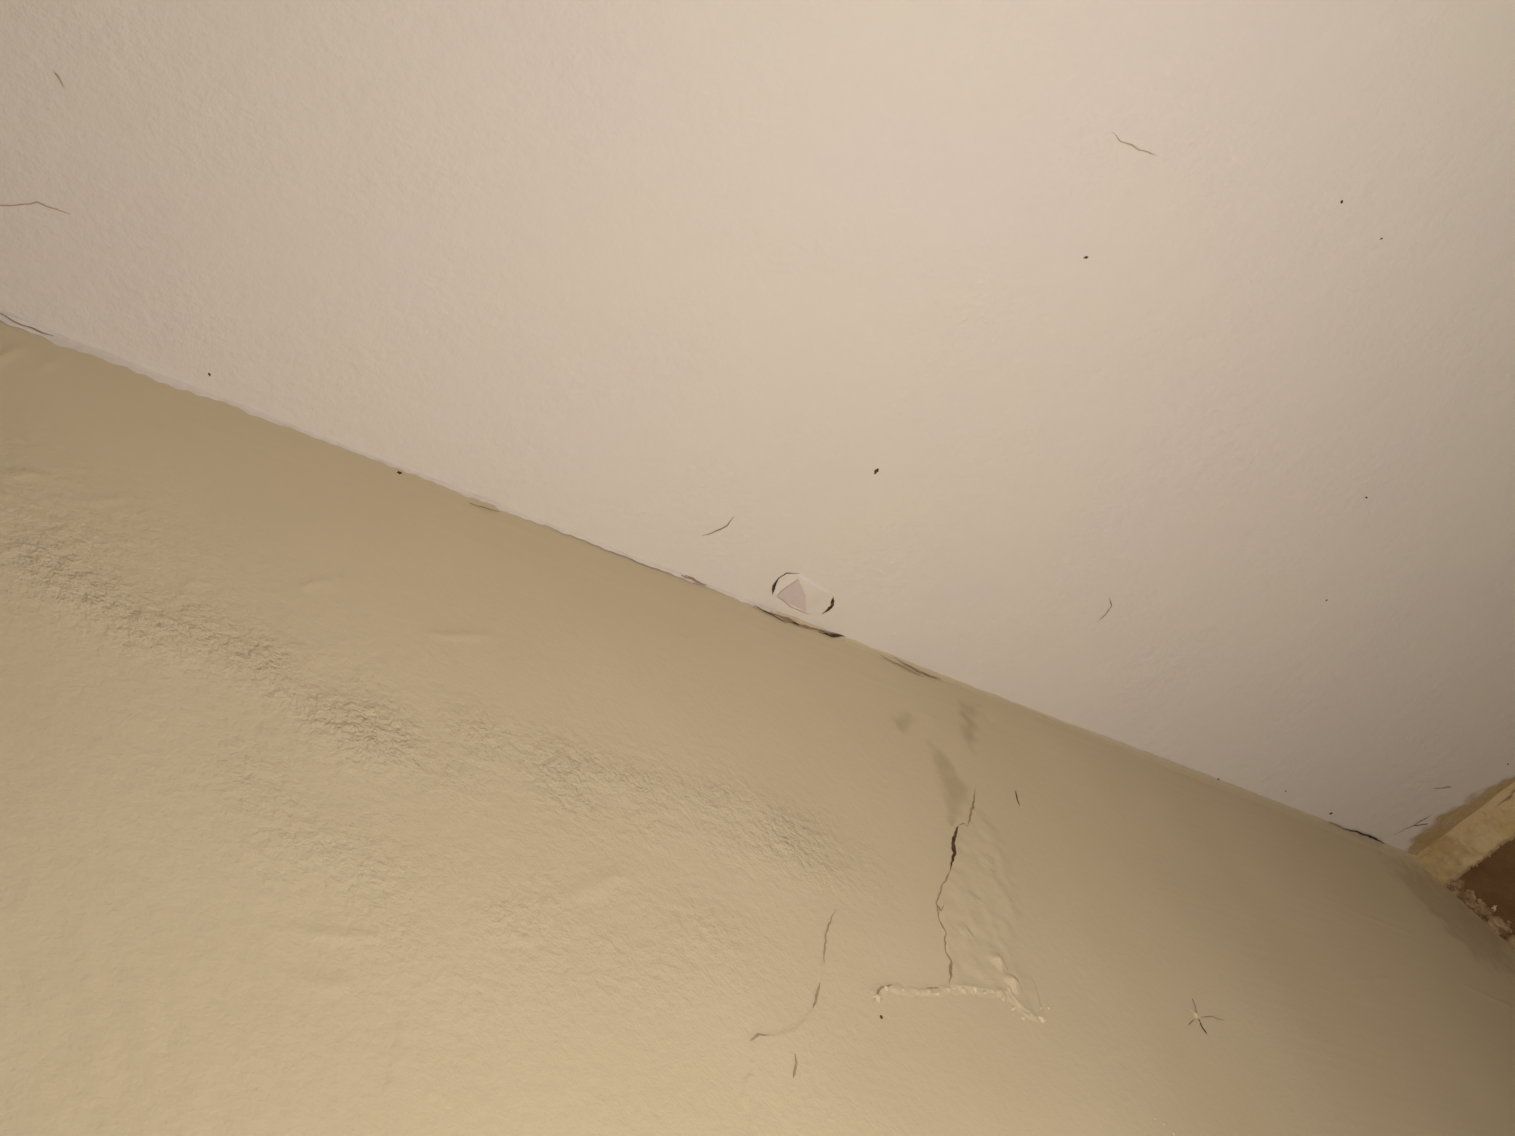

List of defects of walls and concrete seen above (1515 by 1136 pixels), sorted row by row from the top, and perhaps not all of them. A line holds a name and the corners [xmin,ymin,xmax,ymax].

crack [0,201,69,214]
peeling [772,572,834,615]
crack [936,787,1020,984]
flaking render [1446,878,1515,949]